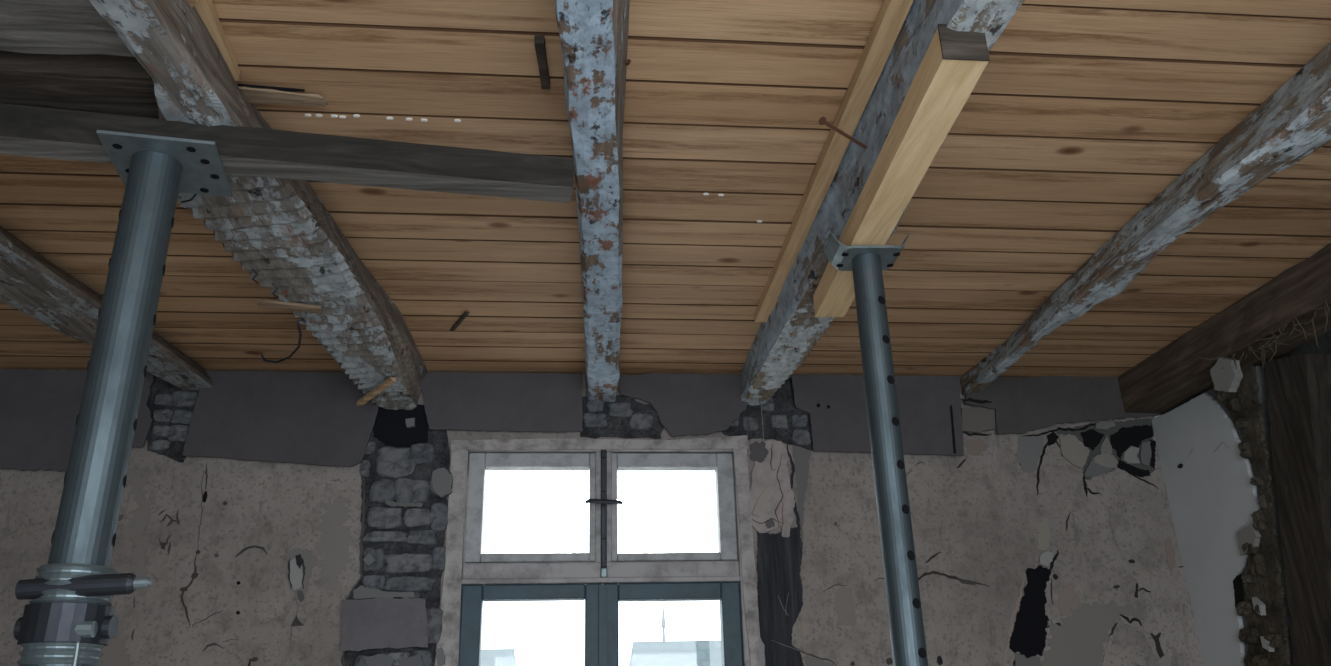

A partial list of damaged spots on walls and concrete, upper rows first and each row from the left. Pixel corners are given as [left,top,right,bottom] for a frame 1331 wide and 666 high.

flaking render [147,376,199,463]
flaking render [722,378,813,537]
crack [918,552,990,587]
crack [961,398,1101,628]
spalling [1009,551,1061,666]
spalling [1046,418,1156,480]